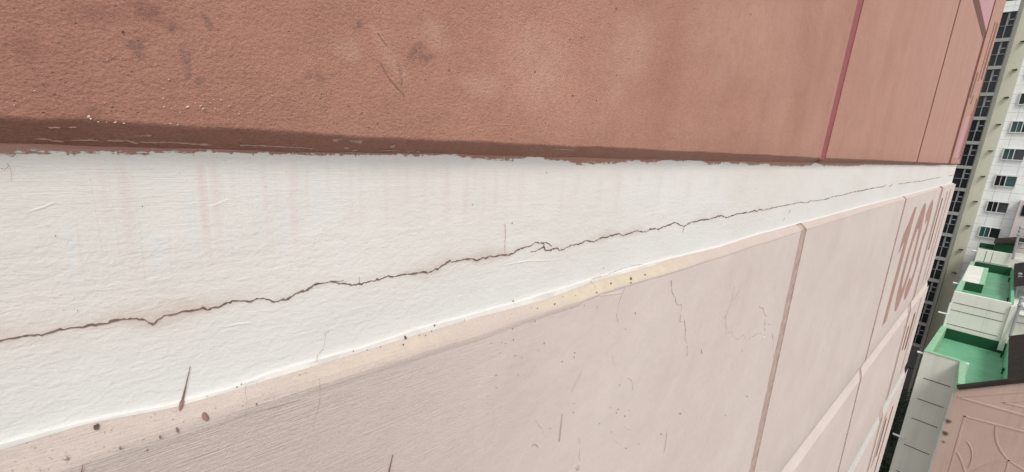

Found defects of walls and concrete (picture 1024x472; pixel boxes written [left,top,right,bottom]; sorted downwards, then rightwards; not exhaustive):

crack [0,175,952,342]